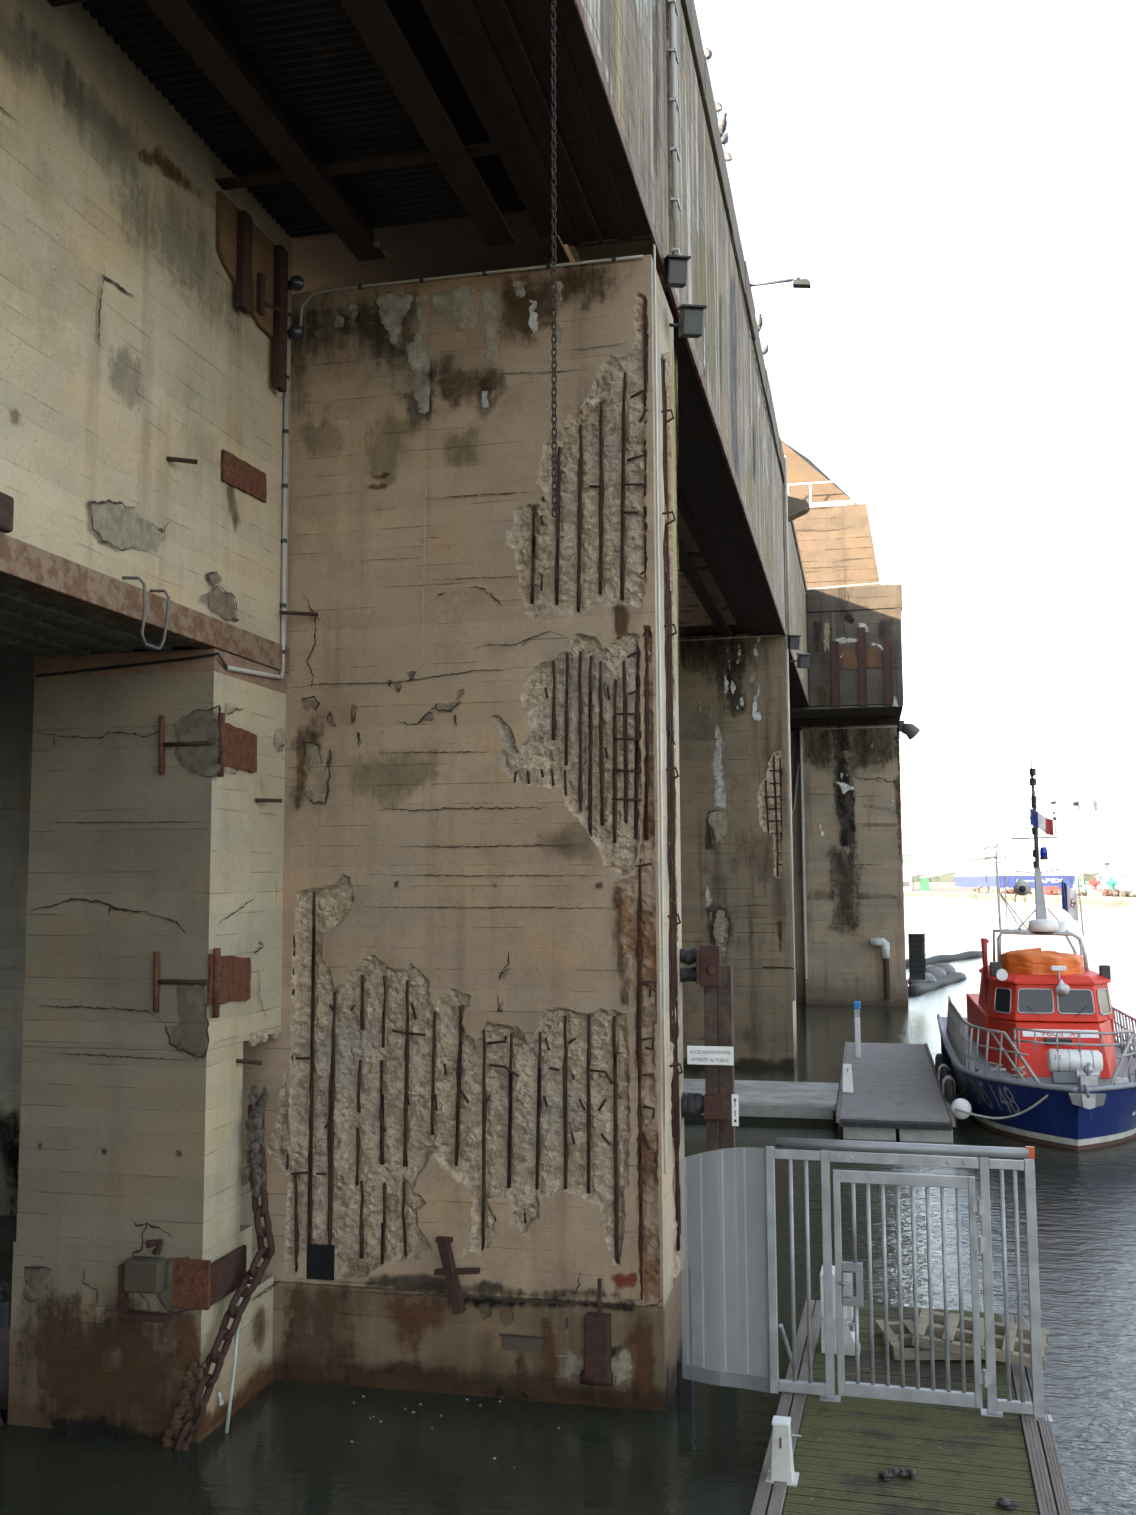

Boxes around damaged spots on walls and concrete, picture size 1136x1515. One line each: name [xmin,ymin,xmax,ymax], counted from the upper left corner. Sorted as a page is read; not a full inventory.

corrosion [140,149,190,189]
damp [291,265,610,423]
spalling [242,290,682,1304]
spalling [757,750,783,878]
damp [804,723,896,936]
corrosion [17,1286,275,1448]
corrosion [385,1292,443,1351]
corrosion [612,1273,637,1288]
corrosion [611,1322,654,1396]